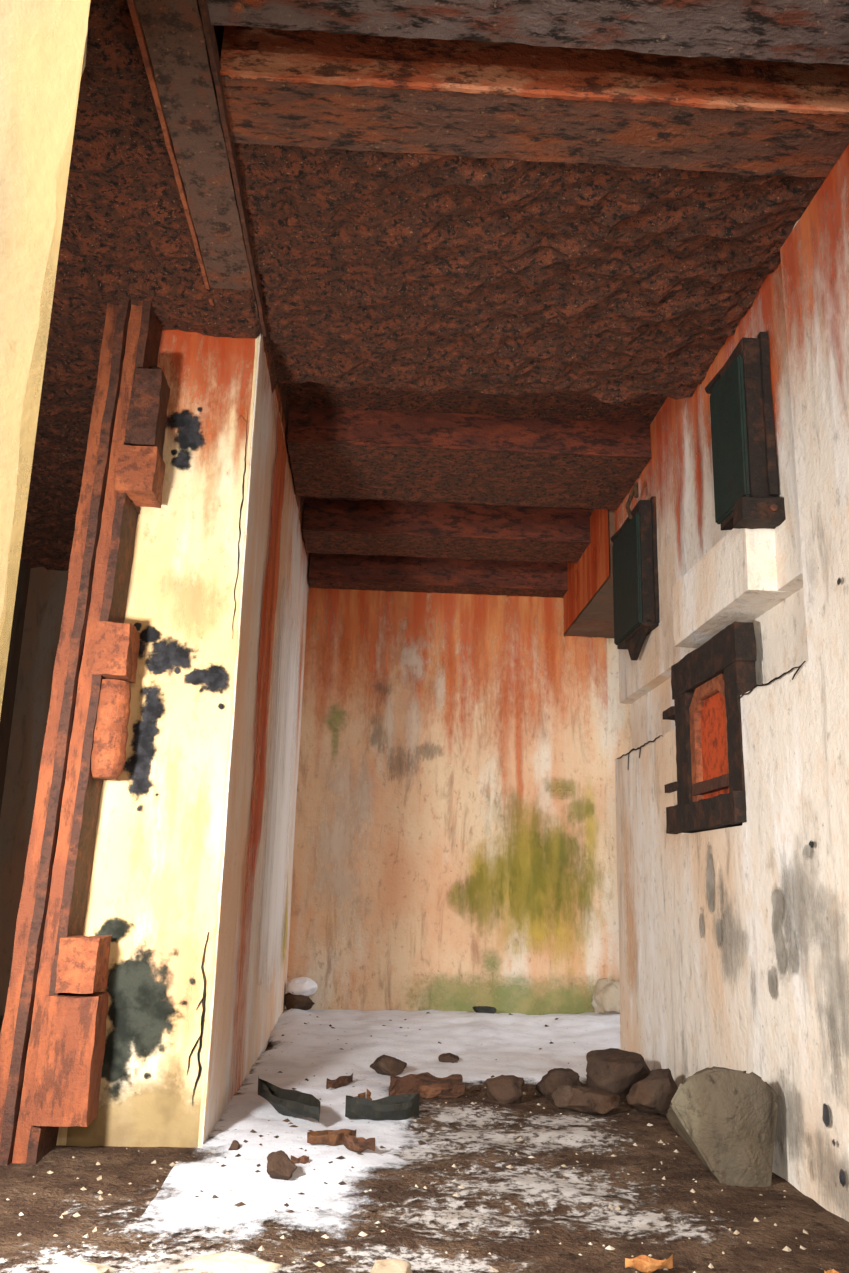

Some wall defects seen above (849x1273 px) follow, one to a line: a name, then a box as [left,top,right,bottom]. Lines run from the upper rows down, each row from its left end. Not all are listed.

rust [243,385,306,925]
rust [299,145,849,794]